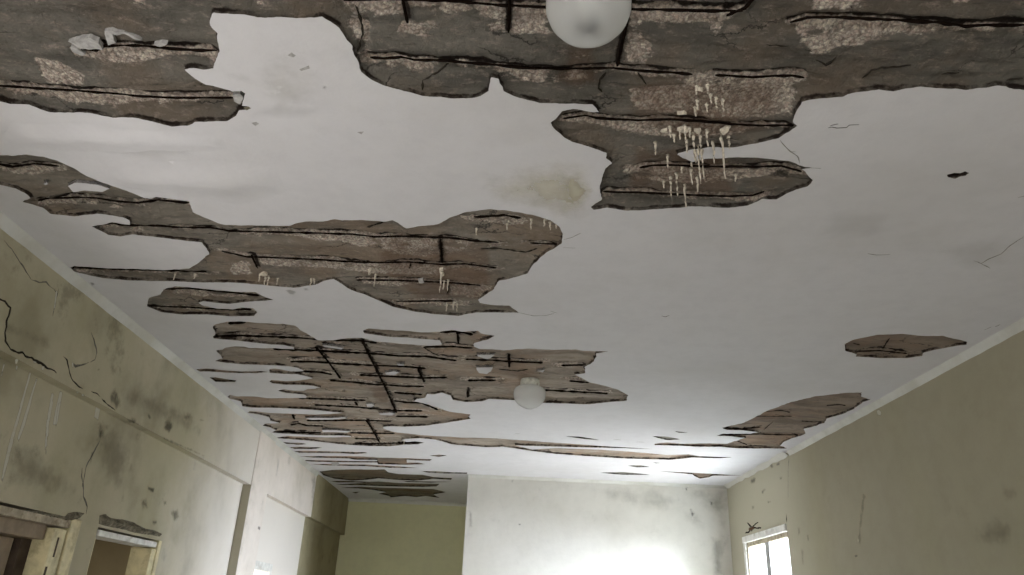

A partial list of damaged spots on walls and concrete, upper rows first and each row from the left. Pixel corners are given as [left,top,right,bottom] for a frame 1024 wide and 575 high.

spalling [0,0,1024,211]
crack [0,298,115,410]
spalling [0,155,870,498]
spalling [845,334,967,358]
crack [81,441,100,513]